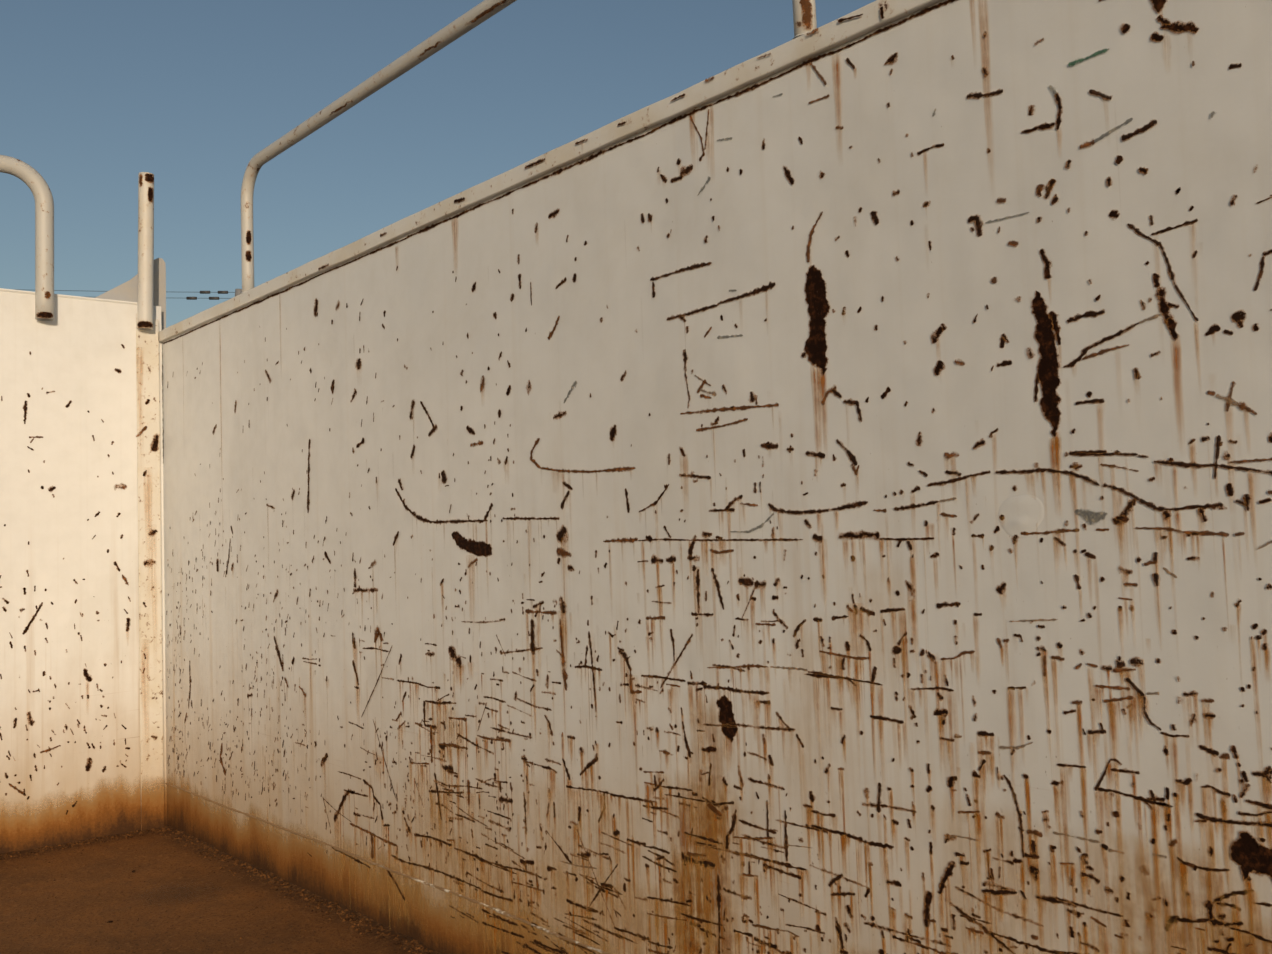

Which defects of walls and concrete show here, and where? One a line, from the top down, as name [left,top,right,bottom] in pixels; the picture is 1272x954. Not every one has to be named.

rust [145,0,955,463]
rust [968,215,983,236]
rust [1036,179,1059,205]
rust [885,462,928,498]
rust [1040,521,1096,559]
rust [1112,499,1136,525]
rust [1119,552,1160,587]
rust [0,479,885,954]
rust [813,593,920,743]
rust [997,621,1161,748]
rust [1240,623,1268,714]
rust [951,776,1131,915]